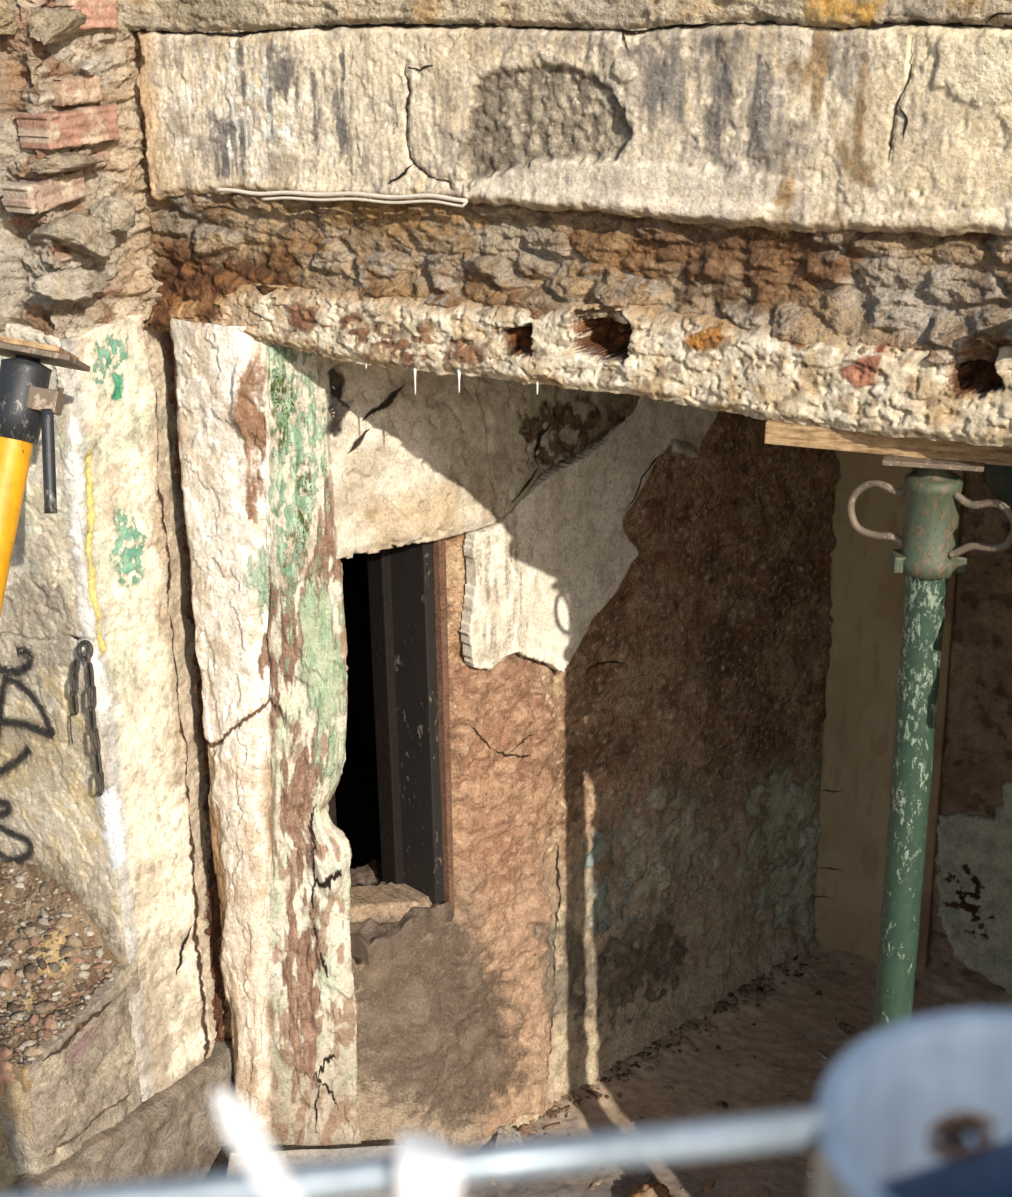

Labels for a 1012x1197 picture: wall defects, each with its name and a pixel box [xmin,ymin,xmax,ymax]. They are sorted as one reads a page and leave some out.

water stain [209,114,246,177]
water stain [237,40,247,98]
water stain [265,42,352,151]
crack [388,62,454,190]
crack [139,12,1012,160]
spalling [501,323,533,356]
spalling [570,308,632,362]
spalling [945,338,1005,397]
flaking render [460,396,718,673]
crack [149,367,286,1060]
flaking render [935,781,1012,995]
crack [303,1054,339,1133]